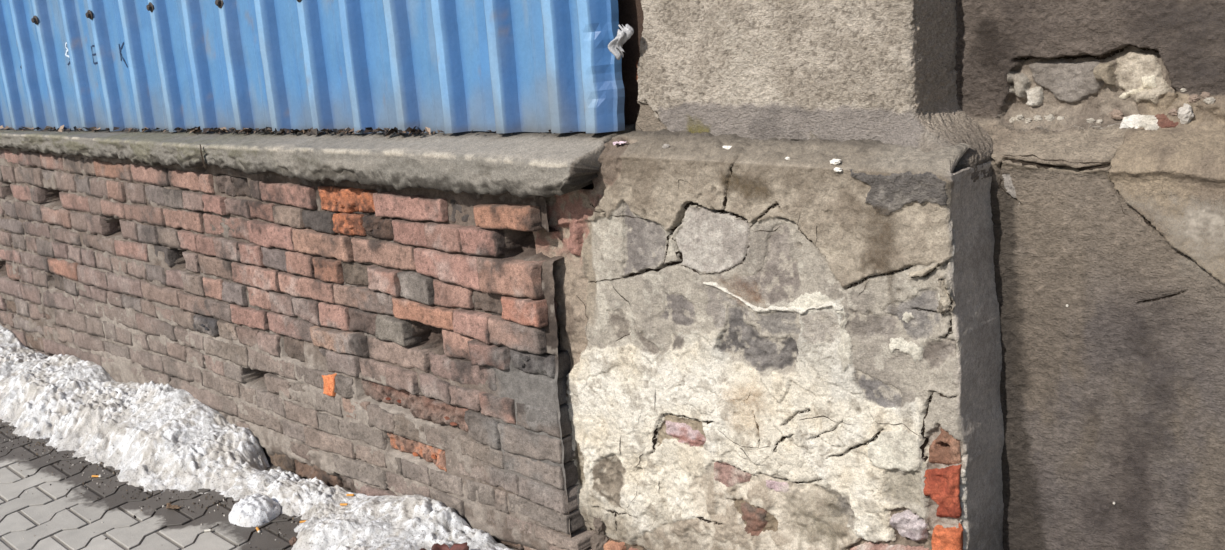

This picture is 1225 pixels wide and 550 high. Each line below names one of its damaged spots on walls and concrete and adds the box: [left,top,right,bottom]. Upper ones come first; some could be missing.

flaking render [999,47,1216,132]
crack [993,154,1111,200]
crack [558,161,826,353]
crack [847,263,953,338]
crack [1139,292,1183,302]
flaking render [657,414,706,447]
flaking render [714,461,778,536]
crack [590,392,956,531]
flaking render [829,424,967,550]
flaking render [603,538,646,550]